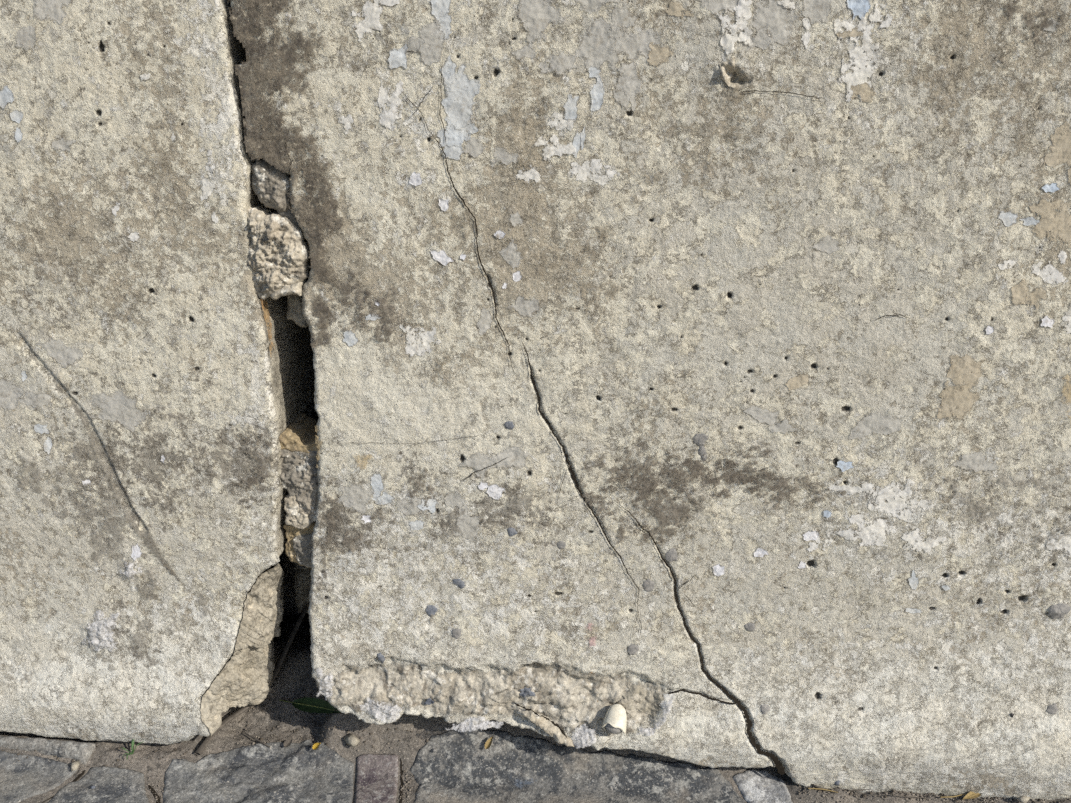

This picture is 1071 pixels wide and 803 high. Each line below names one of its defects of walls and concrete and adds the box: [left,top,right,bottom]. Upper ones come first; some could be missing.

peeling [338,114,354,134]
peeling [352,0,400,42]
peeling [378,0,673,186]
peeling [666,0,893,103]
crack [743,90,824,99]
peeling [430,250,466,266]
peeling [494,212,523,289]
peeling [998,183,1071,334]
crack [398,59,799,775]
spalling [200,494,313,736]
spalling [316,663,675,747]